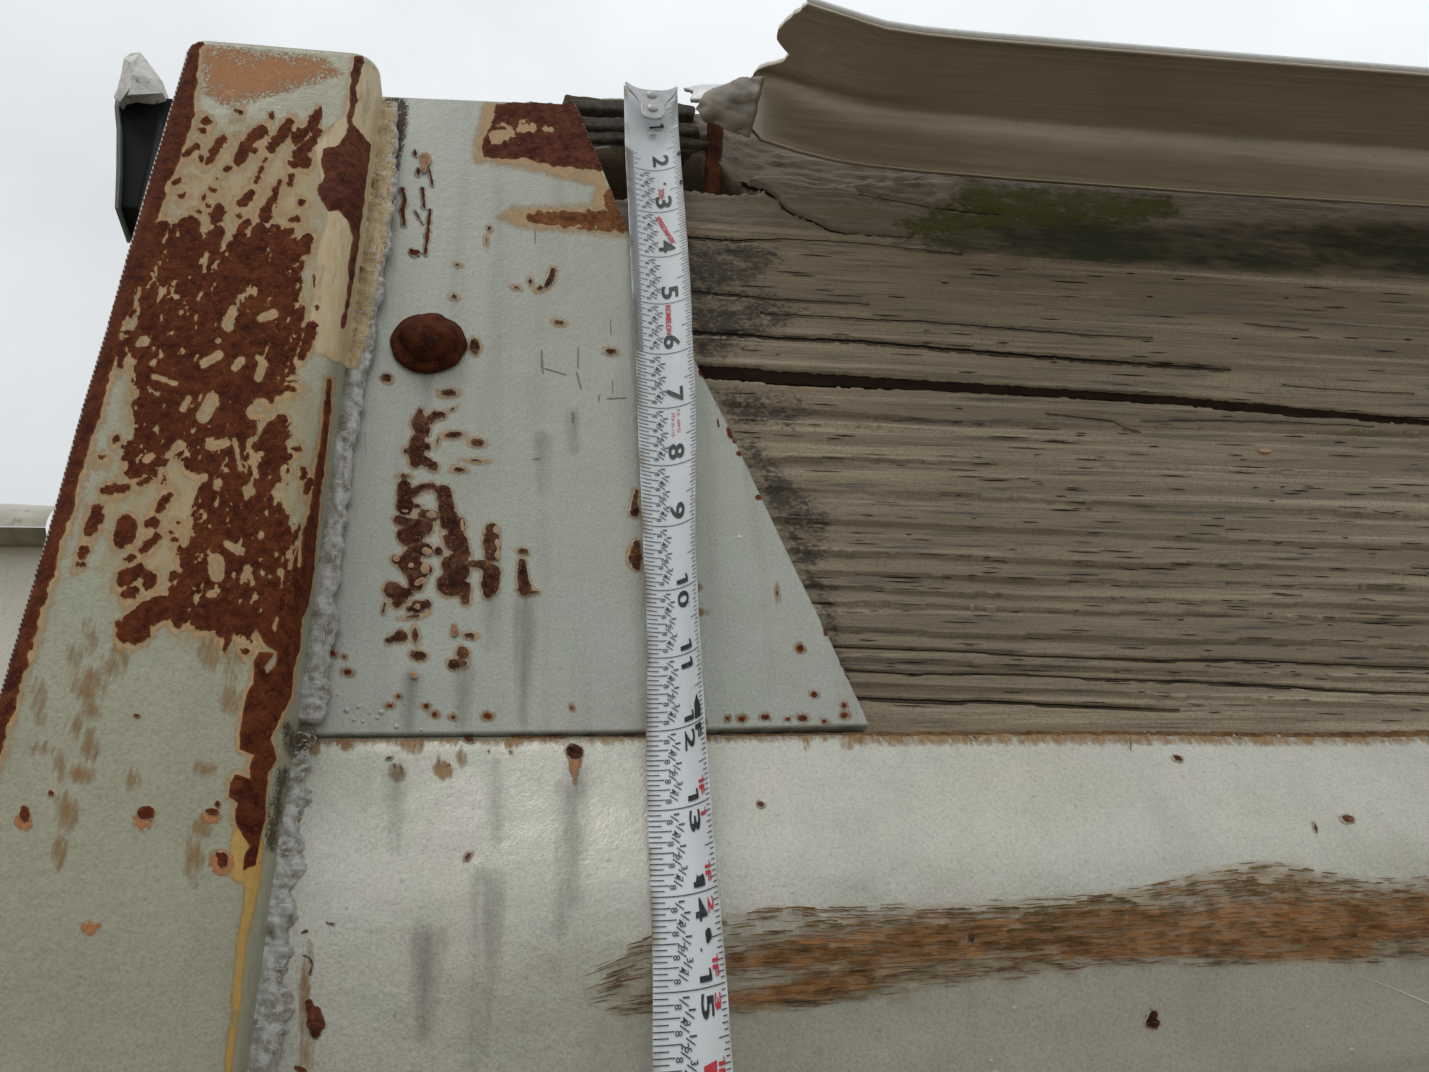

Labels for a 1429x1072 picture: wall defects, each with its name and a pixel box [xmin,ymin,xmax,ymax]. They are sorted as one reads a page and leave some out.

corrosion [473,101,629,246]
crack [1045,384,1429,433]
corrosion [0,41,397,1072]
corrosion [381,387,541,662]
corrosion [422,703,457,721]
corrosion [434,738,462,779]